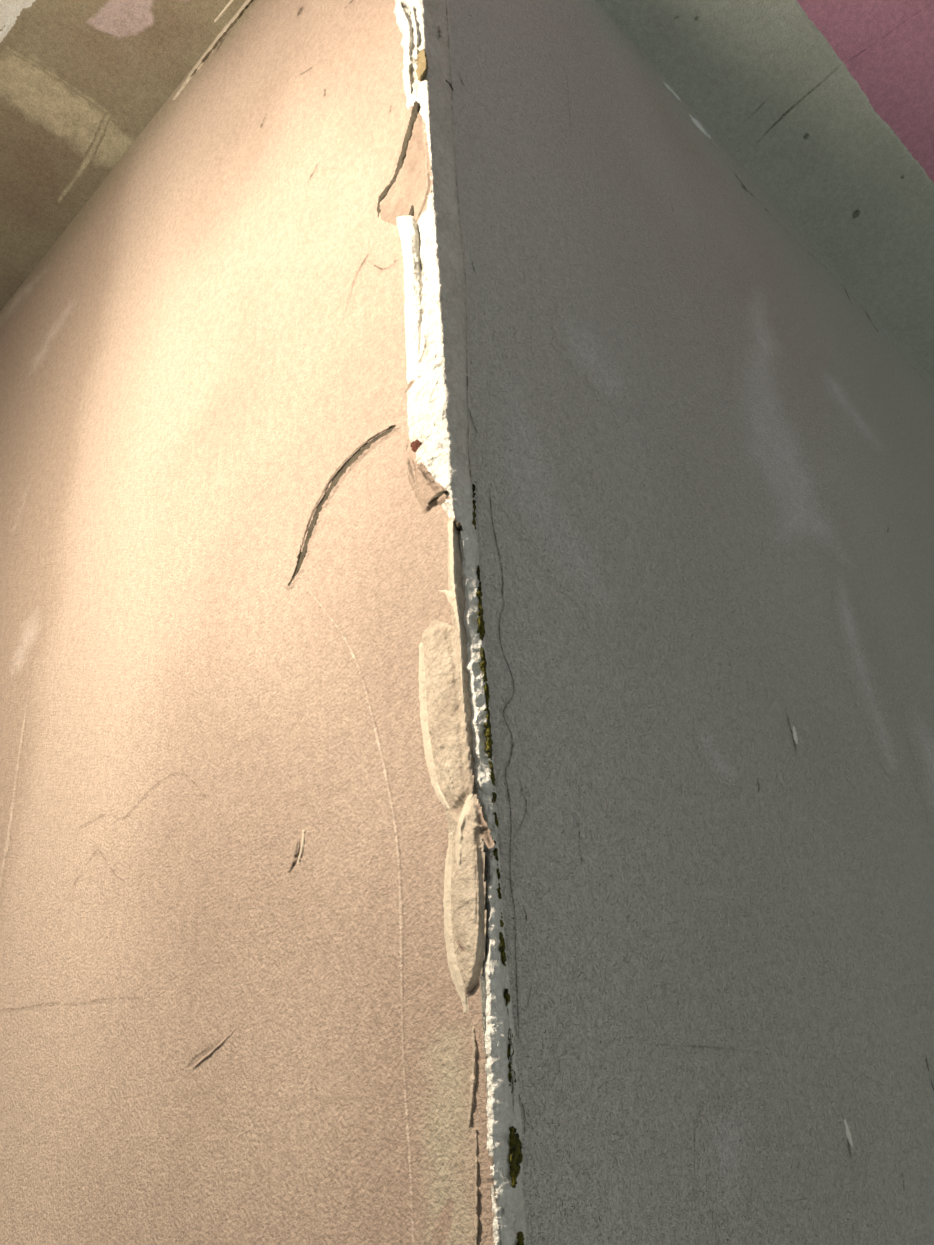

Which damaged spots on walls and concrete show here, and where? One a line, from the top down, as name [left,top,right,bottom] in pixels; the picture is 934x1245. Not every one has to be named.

spalling [416,24,443,82]
crack [282,421,401,591]